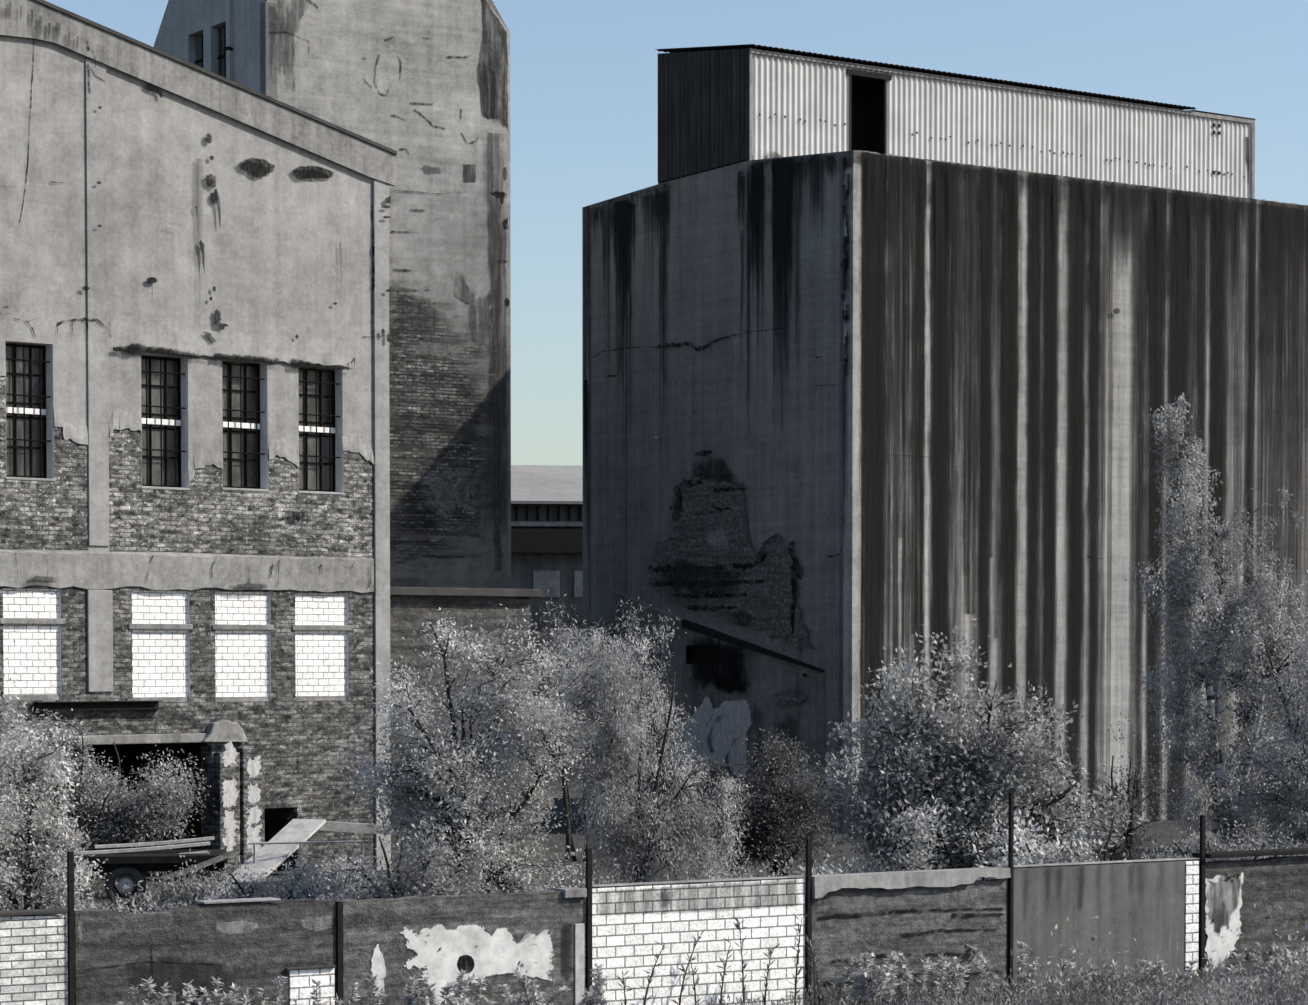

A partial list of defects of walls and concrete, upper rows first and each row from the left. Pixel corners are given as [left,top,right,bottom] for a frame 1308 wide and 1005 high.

leakage [477,0,508,129]
spalling [239,158,275,178]
spalling [293,166,334,180]
leakage [591,201,635,330]
crack [591,328,784,378]
spalling [0,354,88,550]
spalling [109,289,494,563]
leakage [737,152,1308,823]
peeling [669,696,752,776]
peeling [371,944,386,994]
peeling [400,924,555,1004]
peeling [1205,872,1244,972]